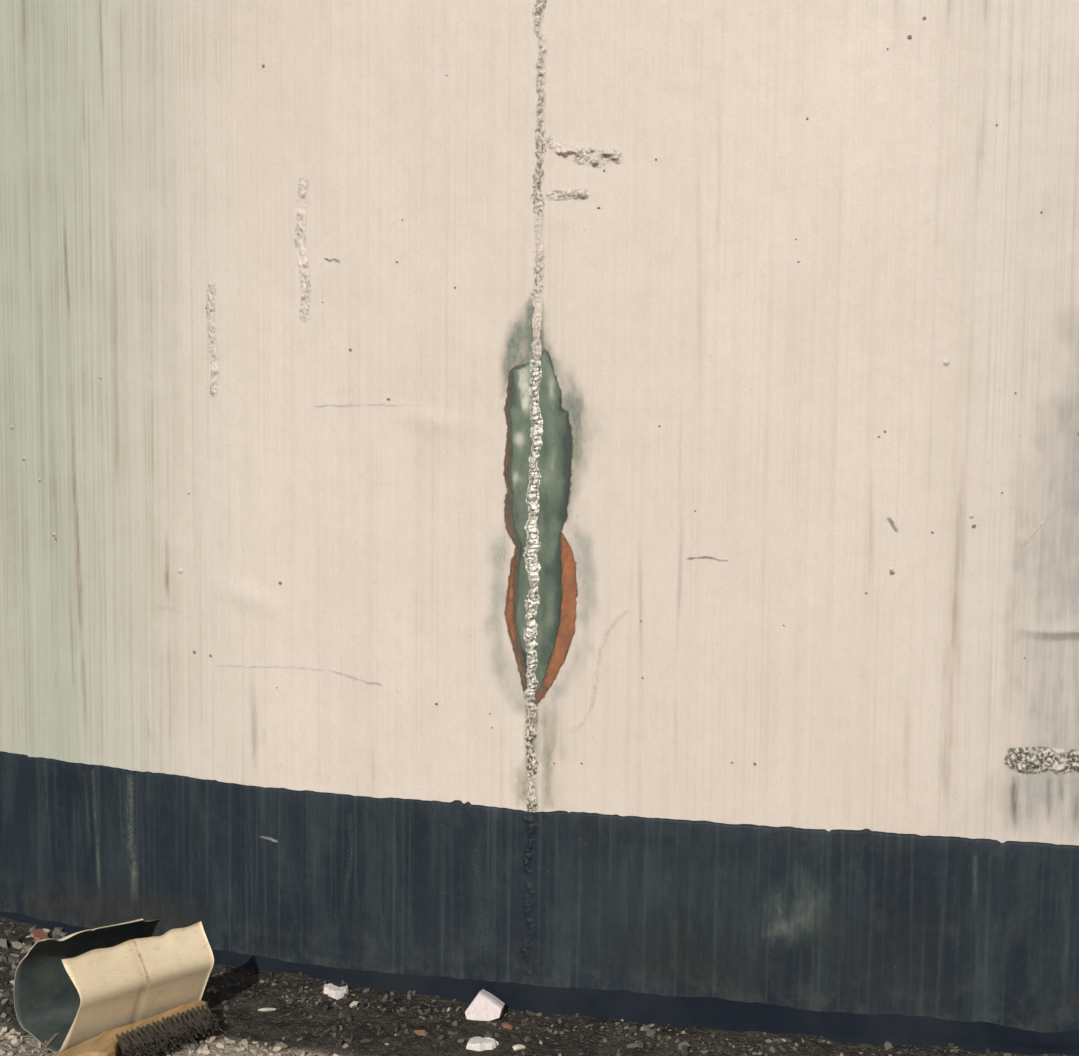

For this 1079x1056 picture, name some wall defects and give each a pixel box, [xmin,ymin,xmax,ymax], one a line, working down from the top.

water stain [505,304,549,381]
water stain [564,394,582,459]
peeling [504,349,578,704]